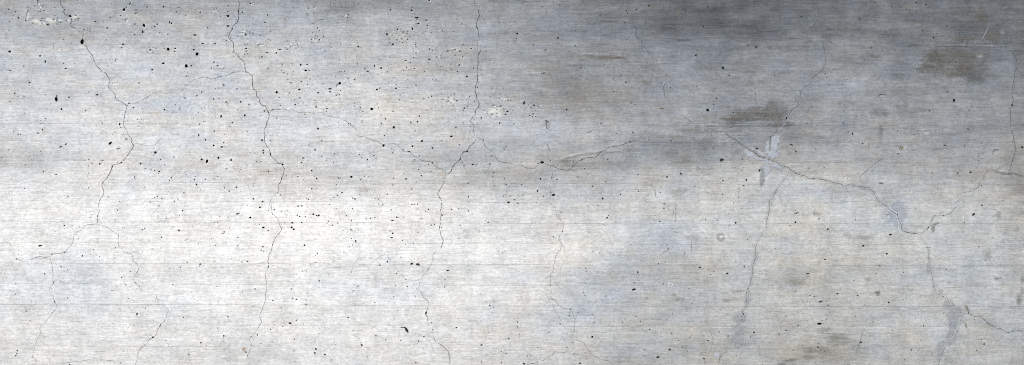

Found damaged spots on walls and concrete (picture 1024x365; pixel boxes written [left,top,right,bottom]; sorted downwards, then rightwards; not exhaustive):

crack [10,1,638,365]
crack [622,3,1021,363]